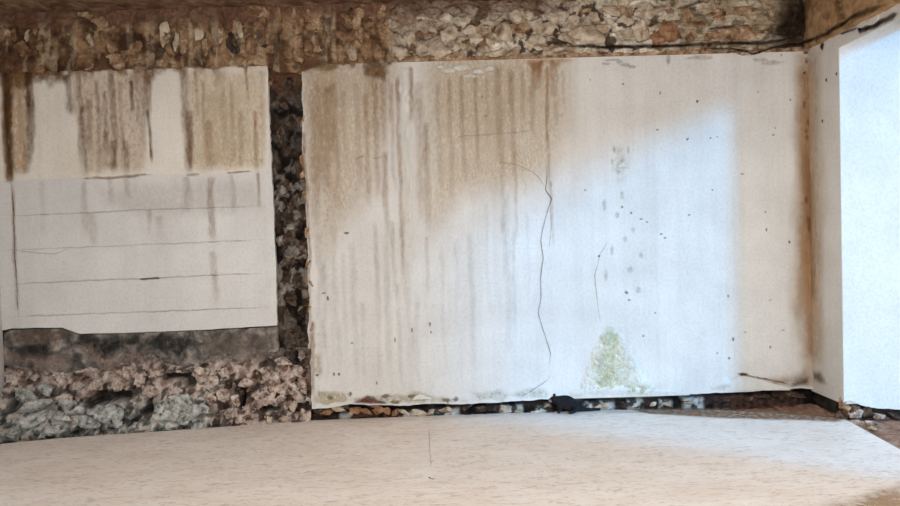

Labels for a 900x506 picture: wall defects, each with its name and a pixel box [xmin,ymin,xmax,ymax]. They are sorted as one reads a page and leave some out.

leakage [1,70,94,180]
leakage [109,68,203,95]
leakage [314,62,390,208]
spalling [0,0,816,444]